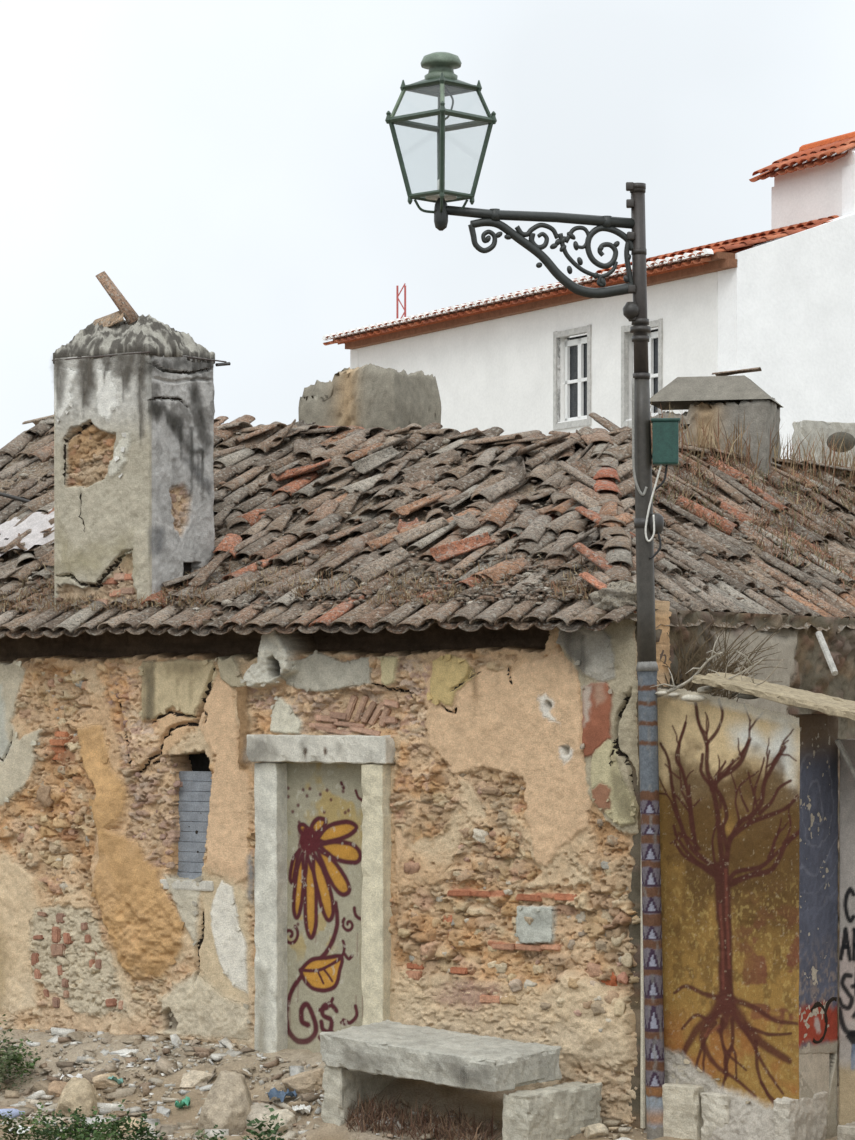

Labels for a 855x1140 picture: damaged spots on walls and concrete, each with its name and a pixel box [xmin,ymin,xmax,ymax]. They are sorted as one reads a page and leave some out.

leakage [54,357,64,393]
spalling [54,367,130,487]
leakage [79,353,211,404]
leakage [141,388,210,488]
spalling [56,552,137,609]
flaking render [427,654,477,706]
spalling [0,630,402,1024]
spalling [394,682,641,1035]